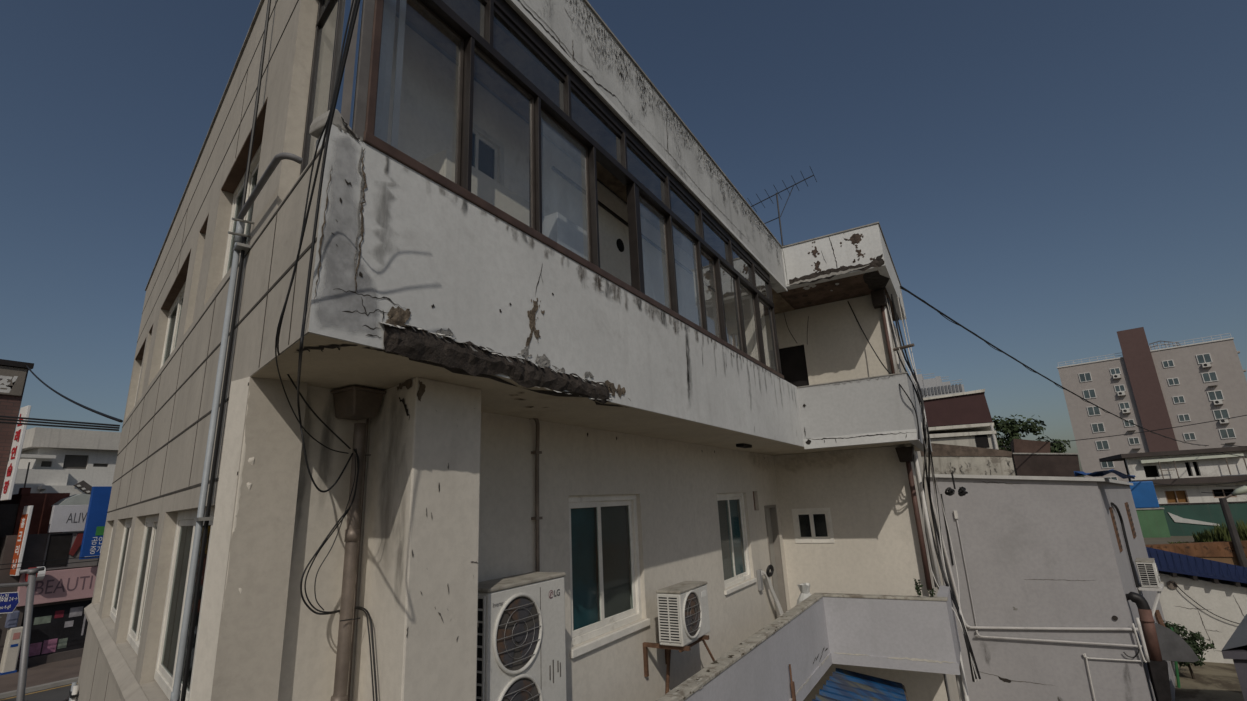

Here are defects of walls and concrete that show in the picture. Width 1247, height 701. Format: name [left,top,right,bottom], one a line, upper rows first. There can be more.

water stain [570,0,780,257]
spalling [787,233,890,305]
spalling [378,293,631,408]